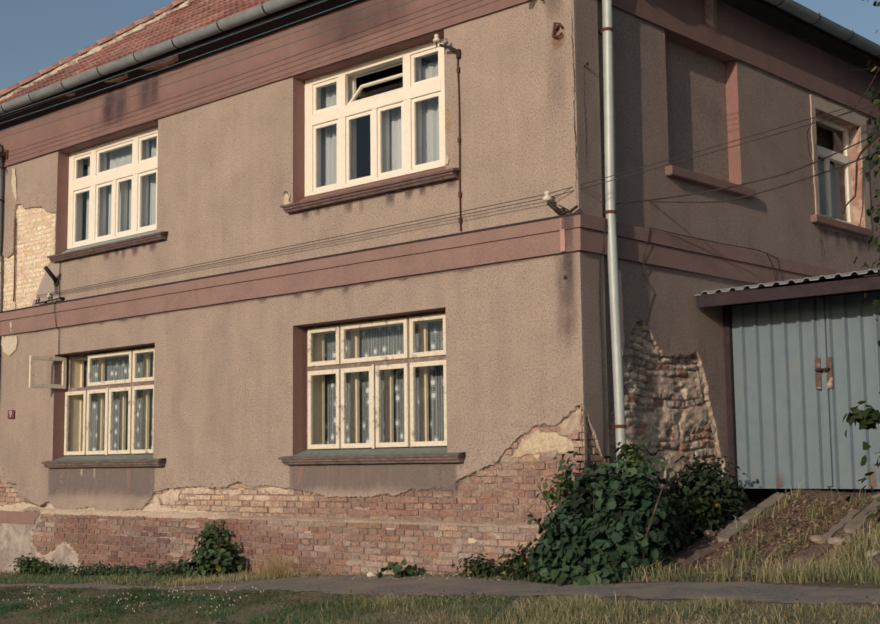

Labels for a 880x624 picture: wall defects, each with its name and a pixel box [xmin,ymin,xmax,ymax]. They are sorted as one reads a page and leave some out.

peeling [0,168,56,312]
flaking render [0,319,726,575]